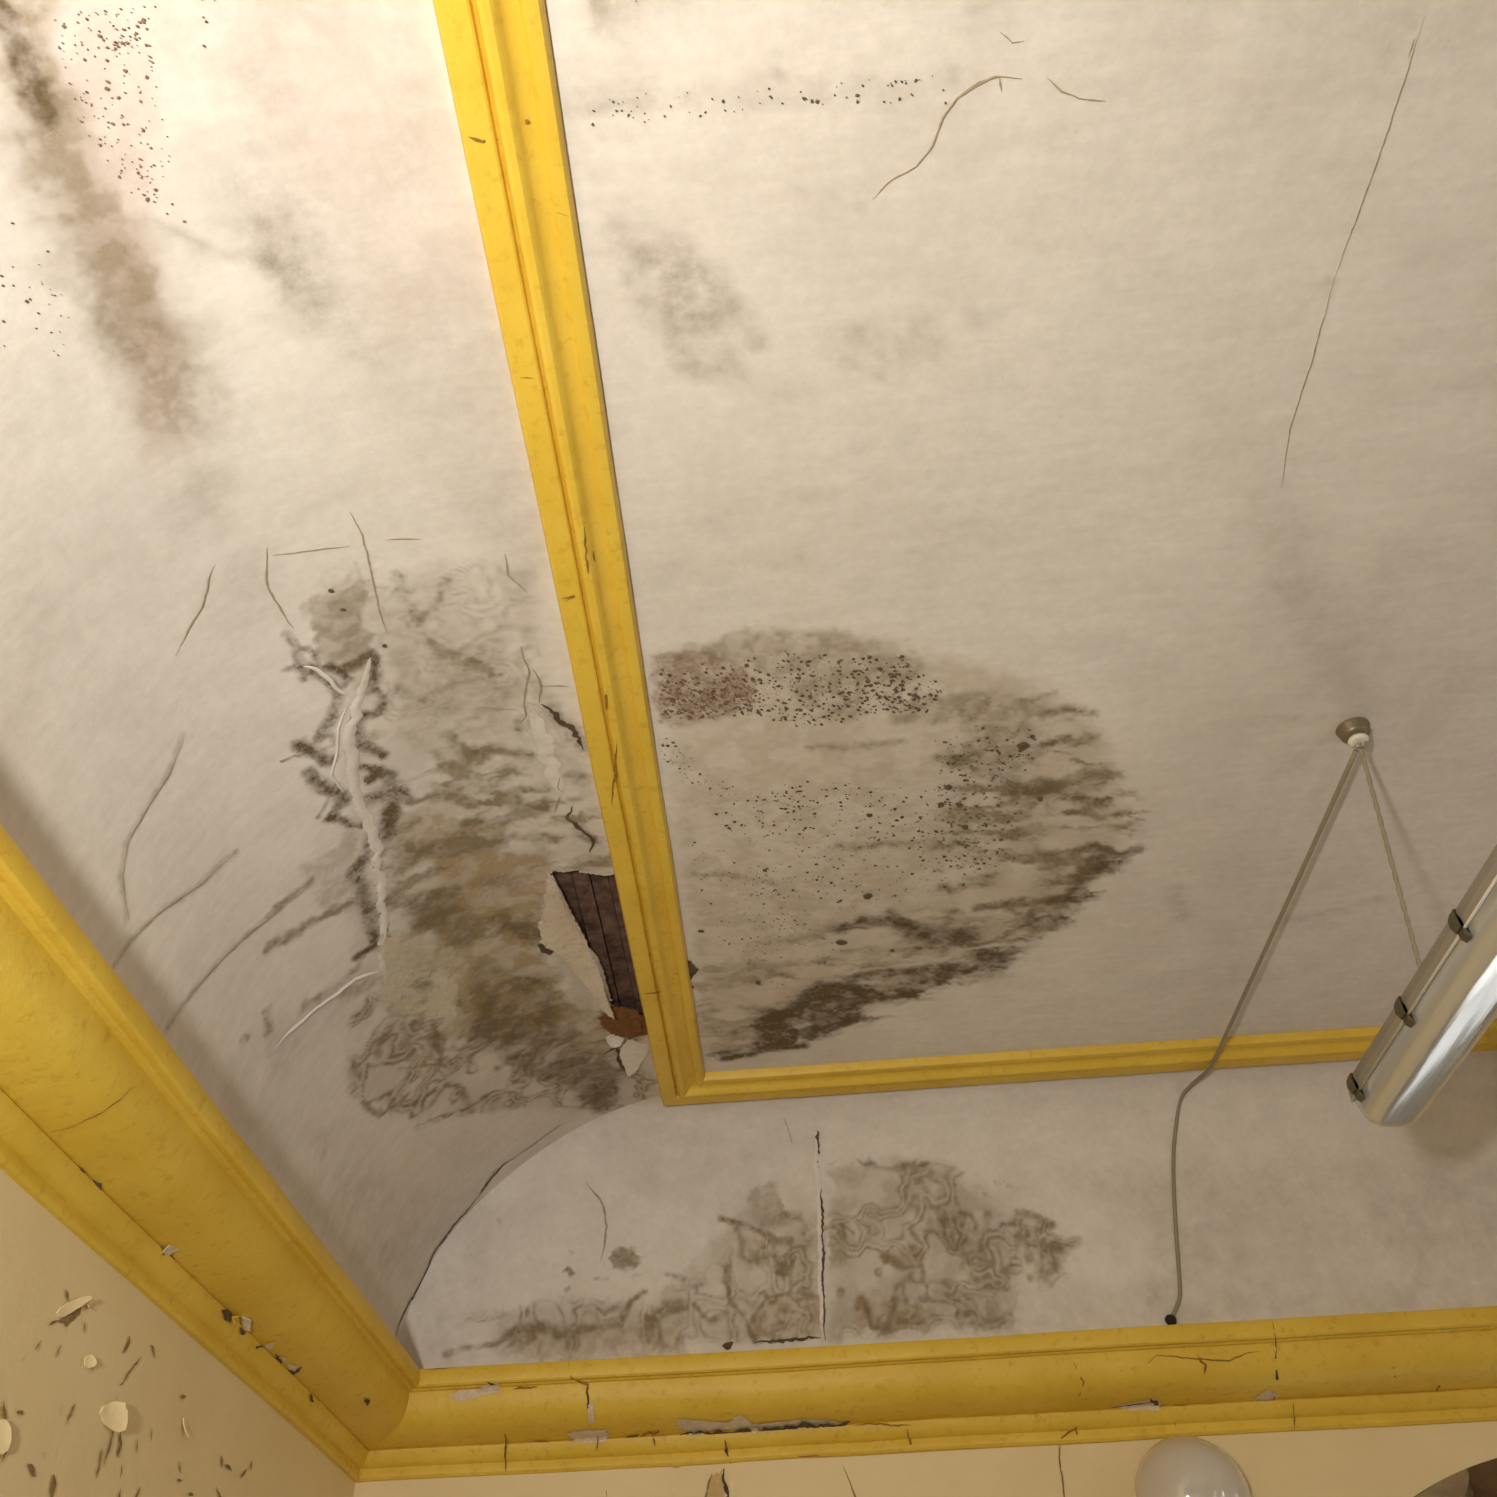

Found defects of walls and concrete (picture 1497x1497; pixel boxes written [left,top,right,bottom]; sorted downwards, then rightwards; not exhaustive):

damp [11,5,186,223]
crack [877,32,1102,195]
crack [1281,18,1424,484]
damp [659,651,942,727]
damp [352,735,652,1118]
flaking render [538,868,649,1076]
damp [661,726,1126,1061]
peeling [49,1290,92,1334]
crack [722,1119,826,1350]
peeling [96,1336,155,1497]
crack [504,1362,912,1497]
flaking render [1468,1459,1497,1497]